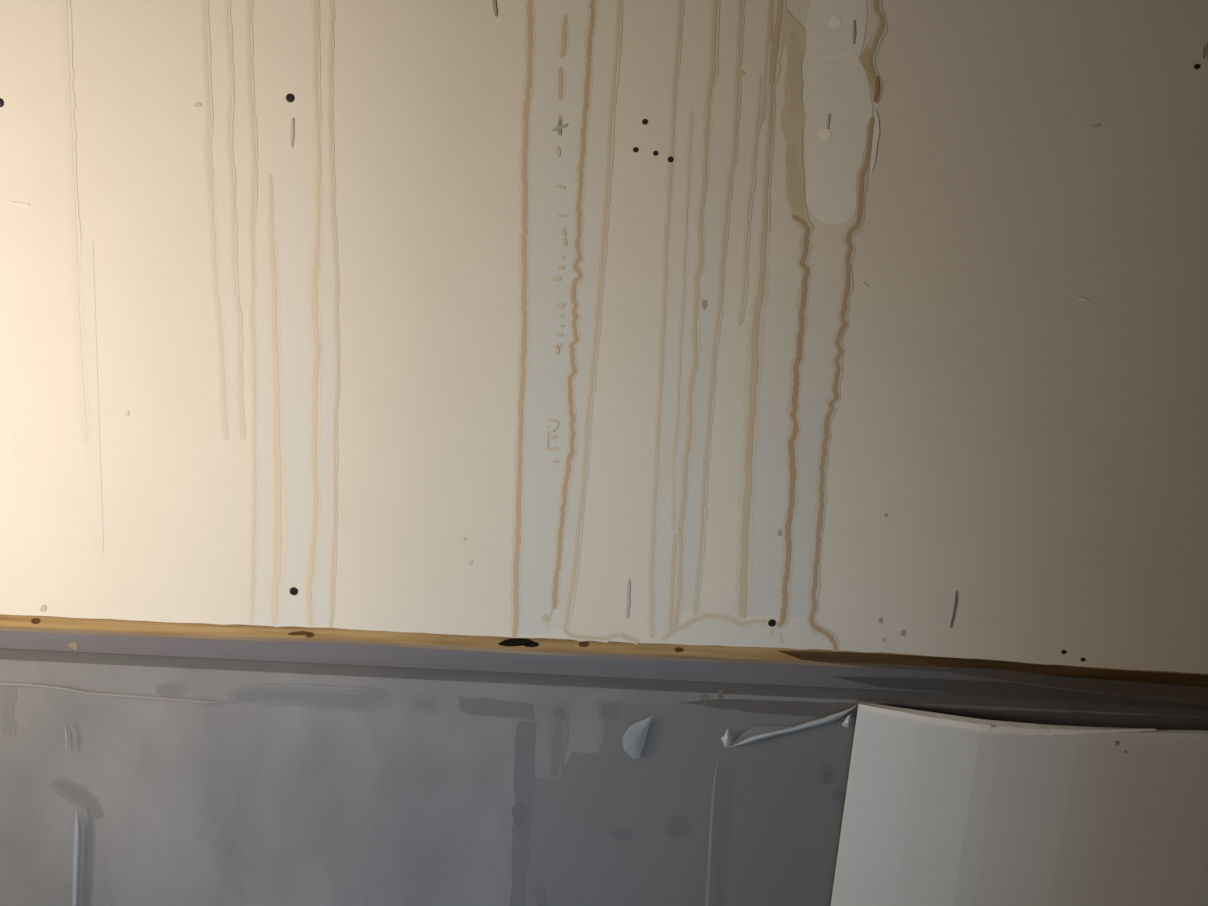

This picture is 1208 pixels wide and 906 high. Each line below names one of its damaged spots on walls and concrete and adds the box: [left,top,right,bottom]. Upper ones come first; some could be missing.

damp [199,0,340,627]
damp [510,0,888,652]